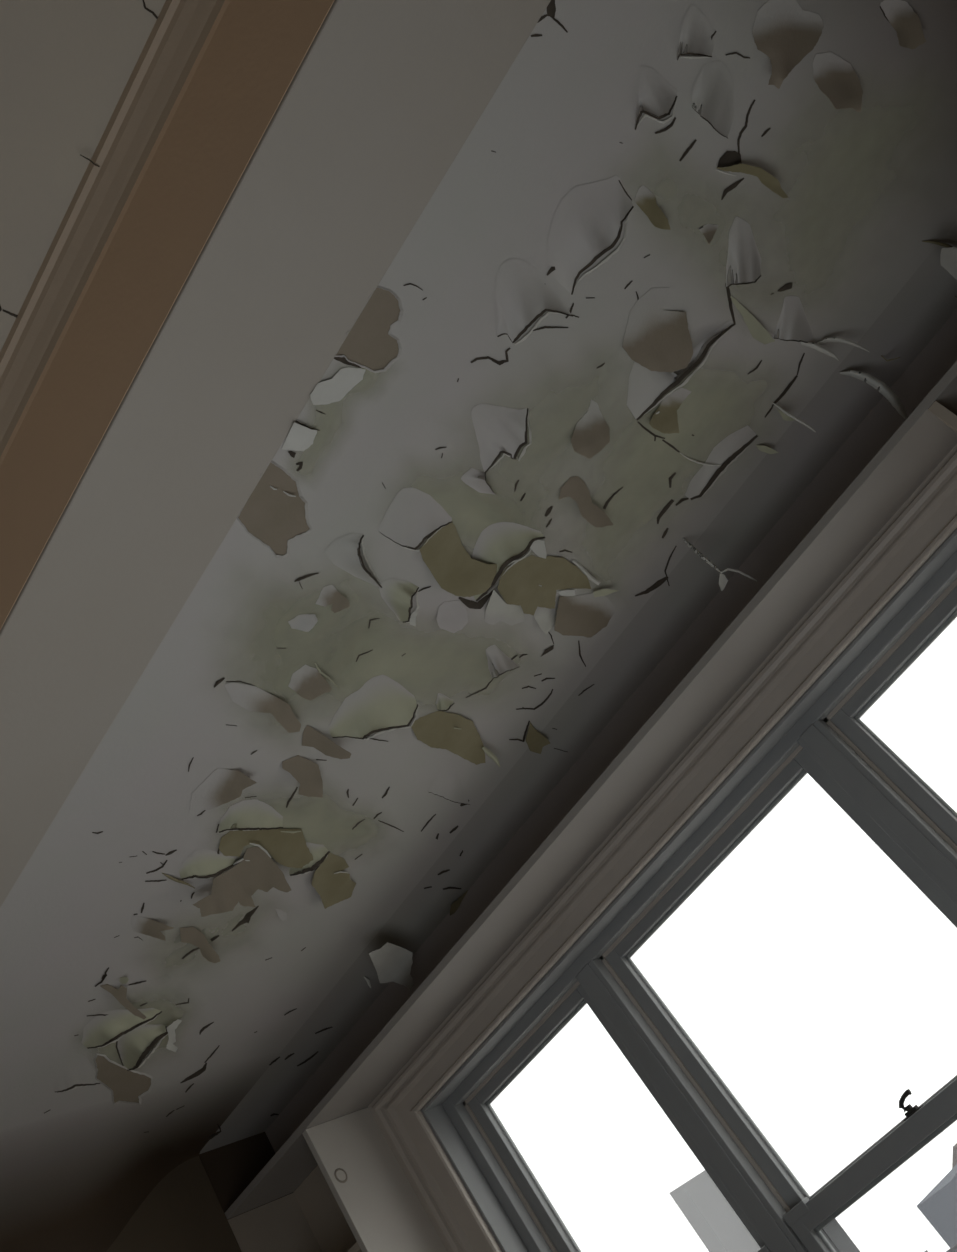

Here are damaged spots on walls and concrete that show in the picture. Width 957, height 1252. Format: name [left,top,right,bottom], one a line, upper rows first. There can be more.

crack [142,0,158,19]
peeling [752,0,863,112]
peeling [634,185,671,230]
peeling [922,241,957,280]
flaking render [310,286,404,415]
peeling [622,287,693,373]
flaking render [237,421,320,558]
peeling [418,521,618,638]
peeling [214,663,351,798]
peeling [411,711,500,767]
peeling [131,829,356,963]
peeling [369,942,414,990]